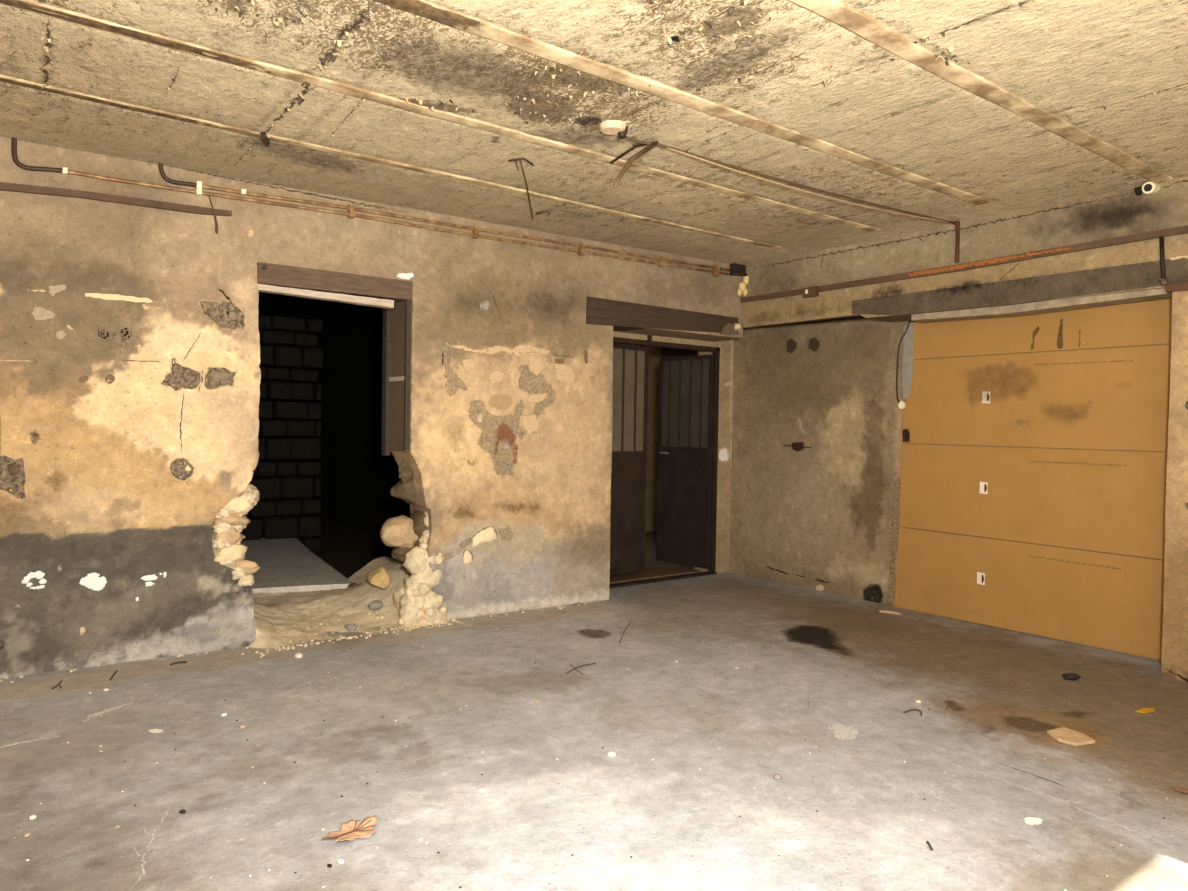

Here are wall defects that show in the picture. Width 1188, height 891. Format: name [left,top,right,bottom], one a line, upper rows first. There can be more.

crack [39,0,56,91]
crack [148,6,401,212]
damp [400,46,534,95]
flaking render [199,289,246,333]
flaking render [161,357,238,392]
peeling [442,342,577,469]
flaking render [0,454,27,504]
spalling [212,484,260,586]
crack [919,751,1182,854]